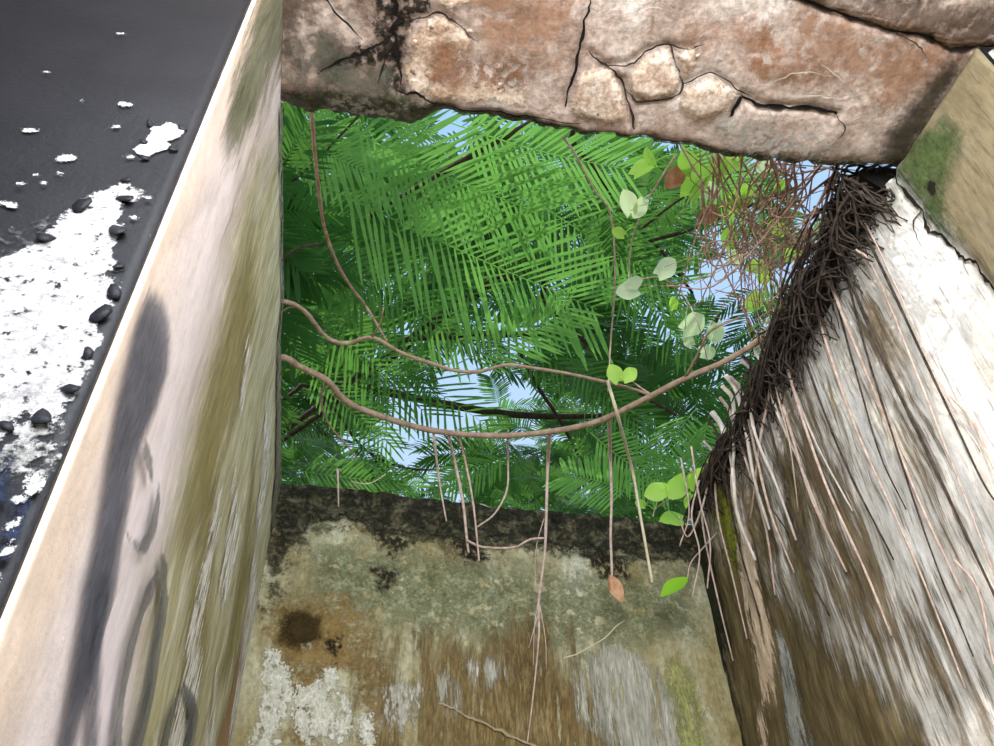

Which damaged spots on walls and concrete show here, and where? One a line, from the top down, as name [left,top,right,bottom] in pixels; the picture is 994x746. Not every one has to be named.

crack [317,0,846,140]
crack [800,0,994,55]
peeling [54,154,77,174]
peeling [126,118,187,161]
peeling [0,177,152,560]
water stain [375,638,399,746]
water stain [417,612,686,746]